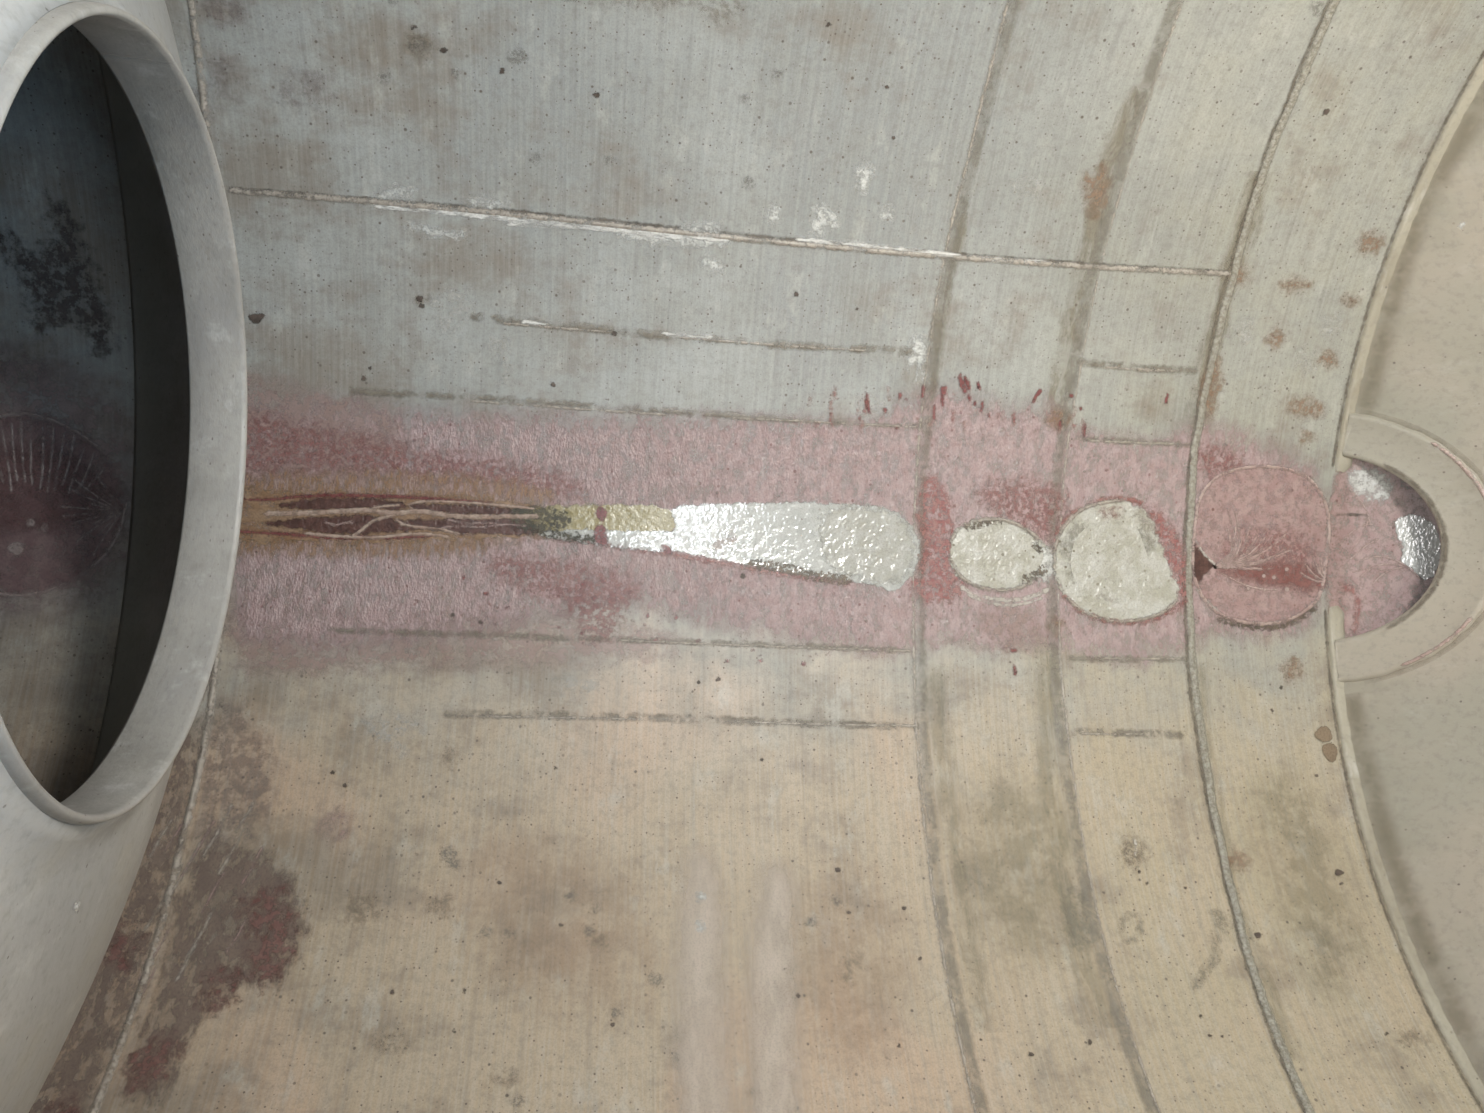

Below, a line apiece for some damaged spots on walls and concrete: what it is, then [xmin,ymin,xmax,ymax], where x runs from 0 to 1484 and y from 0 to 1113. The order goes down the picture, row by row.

corrosion [0,198,110,356]
corrosion [0,413,127,596]
corrosion [235,362,1441,675]
corrosion [29,728,302,1113]